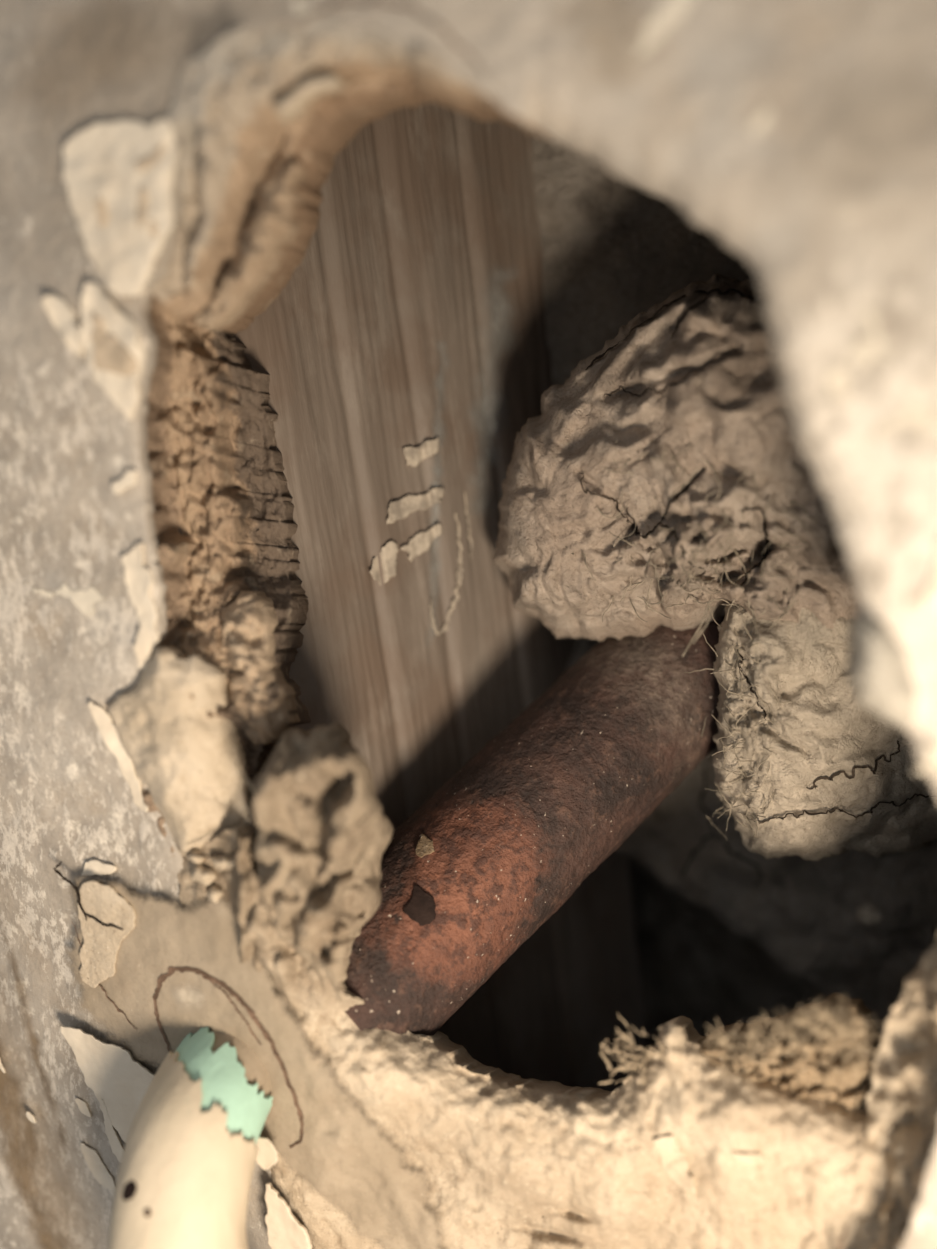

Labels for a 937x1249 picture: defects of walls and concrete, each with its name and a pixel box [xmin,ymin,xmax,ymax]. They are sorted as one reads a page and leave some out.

peeling [630,0,693,62]
peeling [42,282,146,420]
flaking render [62,20,553,857]
peeling [914,745,937,775]
crack [53,861,123,946]
flaking render [77,859,136,988]
flaking render [177,823,937,1249]
peeling [60,1026,155,1201]